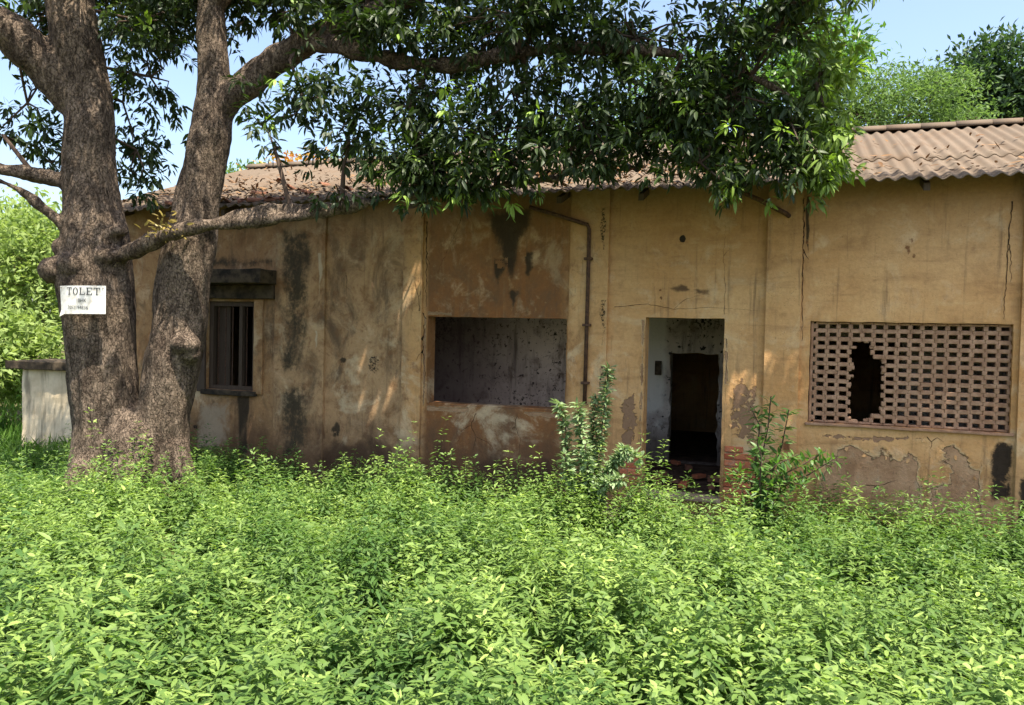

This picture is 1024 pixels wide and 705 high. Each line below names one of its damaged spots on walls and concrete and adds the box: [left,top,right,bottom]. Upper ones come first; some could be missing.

leakage [479,200,541,314]
crack [801,198,809,339]
crack [1003,201,1013,317]
leakage [213,221,403,488]
peeling [615,319,645,482]
peeling [723,338,764,508]
flaking render [812,429,988,520]